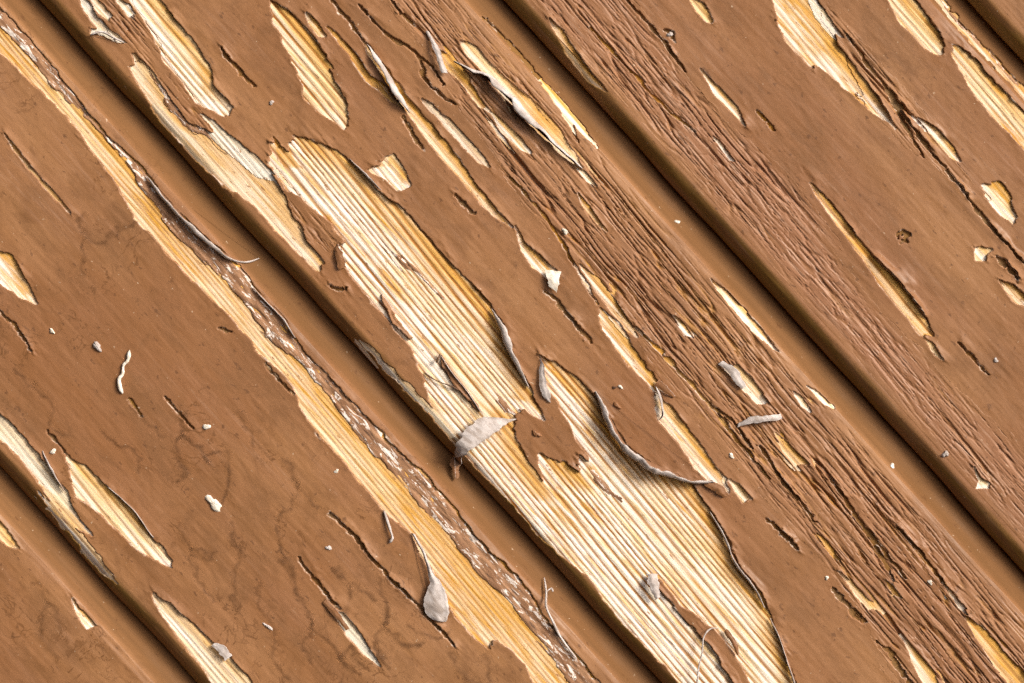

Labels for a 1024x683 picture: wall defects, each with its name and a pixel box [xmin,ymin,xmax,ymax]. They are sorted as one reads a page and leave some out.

peeling [773,0,896,128]
peeling [888,0,1024,149]
peeling [0,0,796,683]
crack [328,0,1024,683]
peeling [718,358,816,471]
peeling [809,183,942,359]
peeling [981,181,1017,224]
peeling [927,580,1024,683]